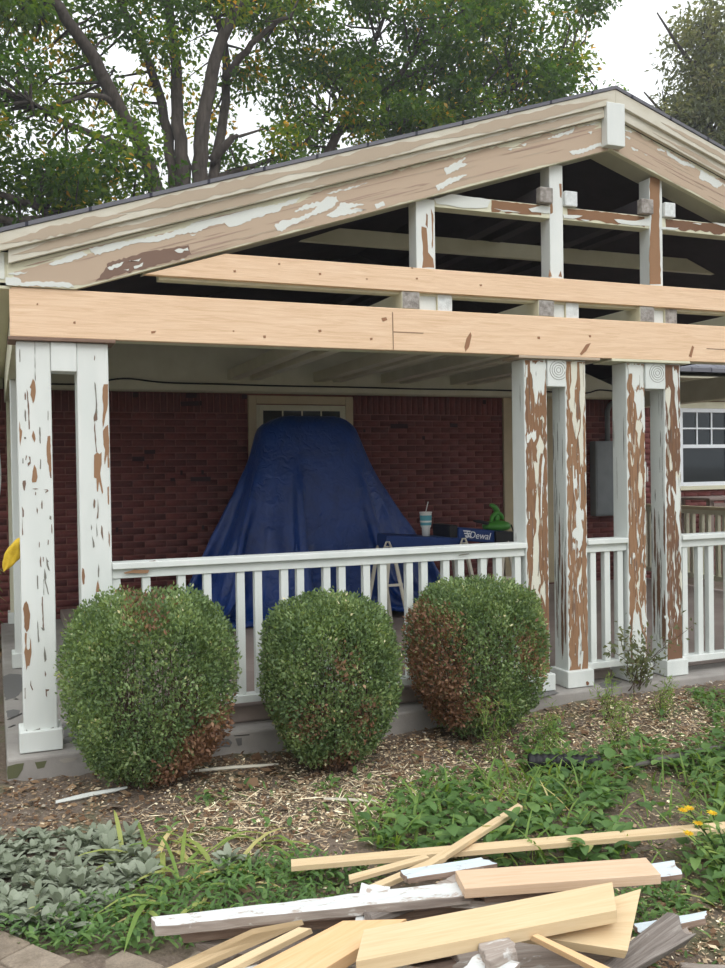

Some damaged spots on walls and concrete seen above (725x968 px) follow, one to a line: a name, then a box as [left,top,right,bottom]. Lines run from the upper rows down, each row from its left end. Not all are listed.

peeling [1,99,725,288]
peeling [19,422,51,473]
peeling [94,384,110,505]
peeling [525,359,588,674]
peeling [627,362,682,663]
peeling [23,601,32,670]